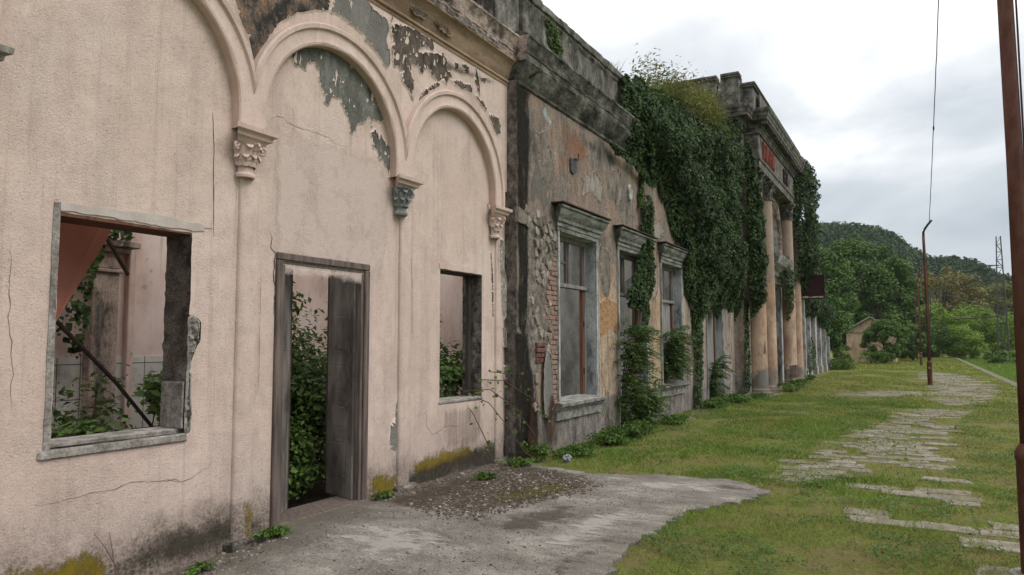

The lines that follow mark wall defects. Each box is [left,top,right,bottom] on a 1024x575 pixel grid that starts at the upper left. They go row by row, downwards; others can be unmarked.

peeling [289,47,392,179]
peeling [233,0,502,136]
water stain [370,84,639,572]
peeling [388,398,399,453]
water stain [128,521,230,572]